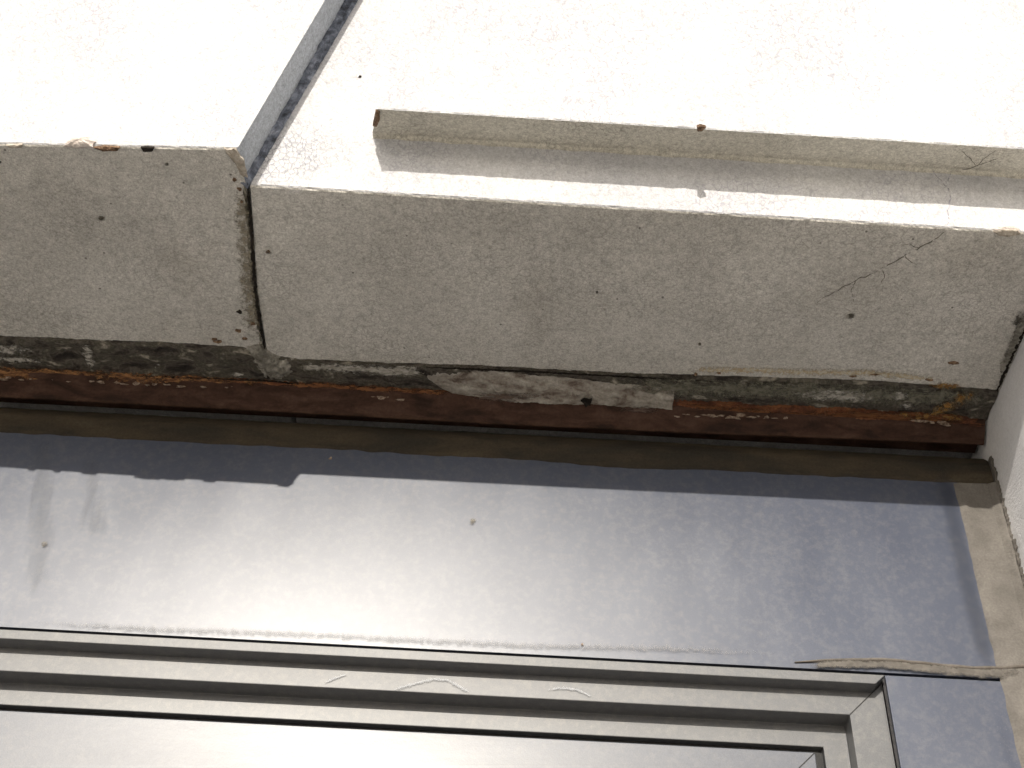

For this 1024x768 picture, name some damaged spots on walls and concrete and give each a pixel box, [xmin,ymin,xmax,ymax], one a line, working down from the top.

crack [247,139,319,349]
crack [817,152,1007,303]
corrosion [0,367,449,395]
peeling [304,363,788,419]
corrosion [672,383,985,427]